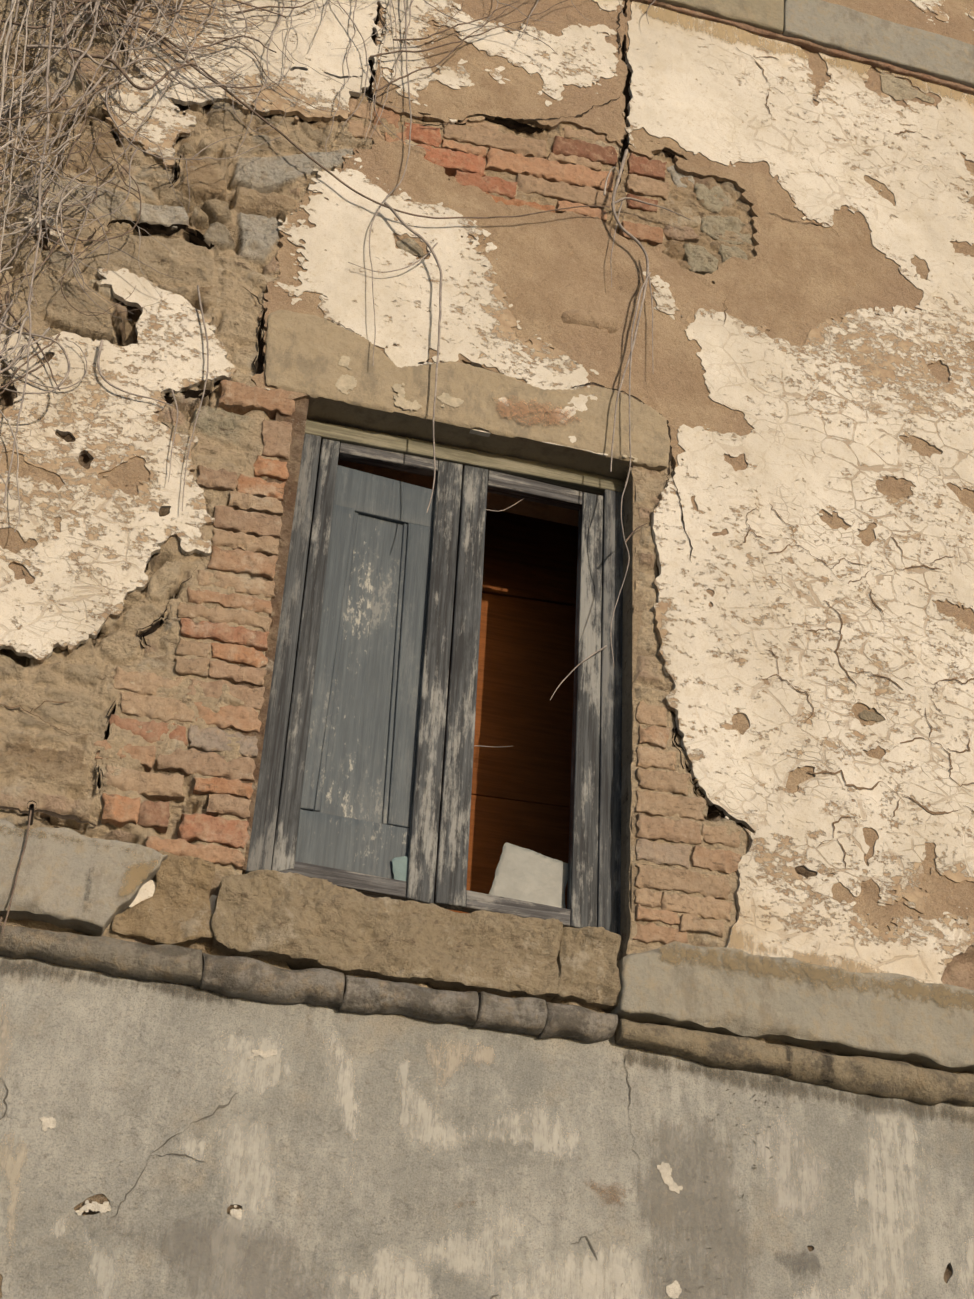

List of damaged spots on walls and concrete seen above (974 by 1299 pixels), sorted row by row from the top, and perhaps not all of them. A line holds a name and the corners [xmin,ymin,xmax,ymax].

peeling [823,0,974,45]
crack [420,0,633,186]
peeling [335,0,929,471]
crack [245,288,265,374]
peeling [251,190,328,401]
peeling [0,523,38,584]
peeling [819,510,877,546]
crack [743,504,974,869]
peeling [852,703,885,726]
crack [672,727,750,831]
peeling [827,828,974,935]
crack [111,1092,239,1218]